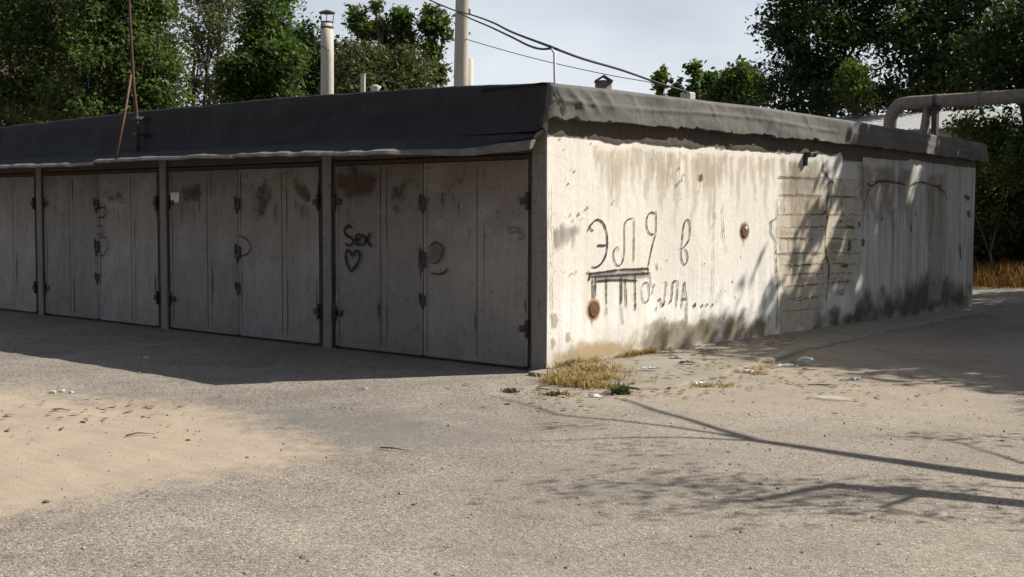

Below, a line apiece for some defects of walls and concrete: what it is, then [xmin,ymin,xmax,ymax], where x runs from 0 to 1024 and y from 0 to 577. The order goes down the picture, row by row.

spalling [770,176,865,333]
leakage [812,277,965,329]